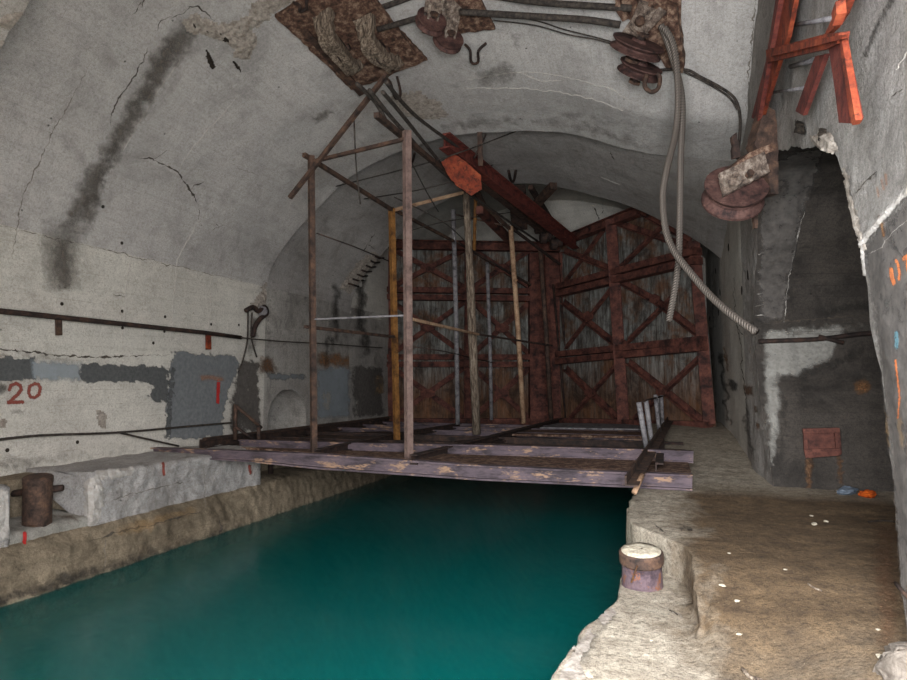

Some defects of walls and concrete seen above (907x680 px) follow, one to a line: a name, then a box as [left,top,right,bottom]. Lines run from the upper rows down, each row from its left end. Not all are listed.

crack [110,5,215,124]
spalling [182,0,296,72]
crack [1,64,235,281]
damp [47,25,191,288]
crack [0,348,170,359]
peeling [0,351,305,440]
peeling [317,365,384,418]
peeling [842,168,907,616]